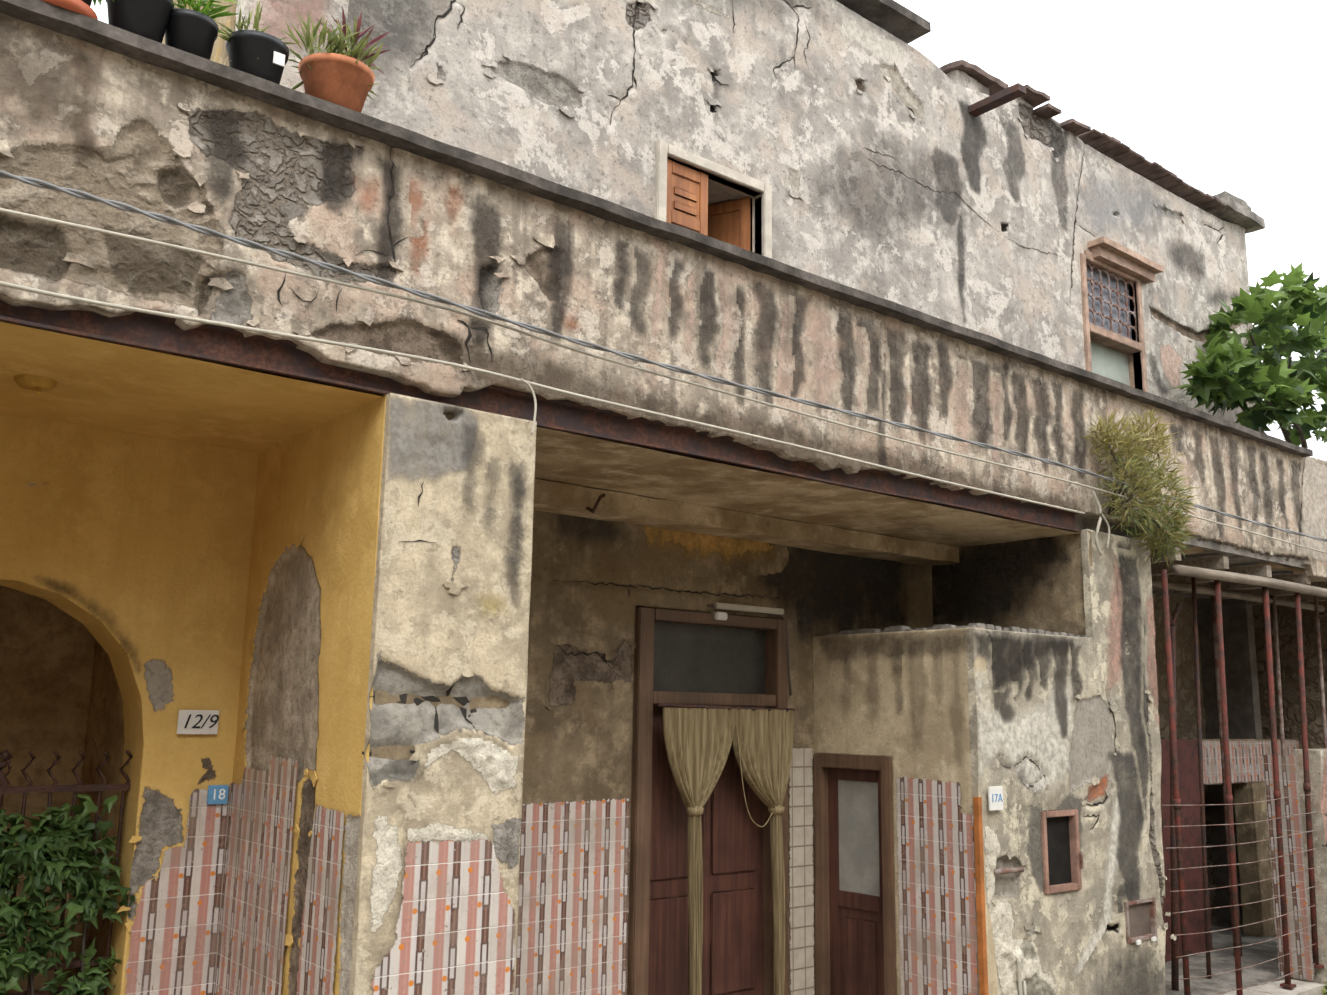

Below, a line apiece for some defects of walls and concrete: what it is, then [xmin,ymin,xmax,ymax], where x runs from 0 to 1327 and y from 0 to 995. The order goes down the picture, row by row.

crack [410,0,465,67]
crack [608,2,687,125]
crack [773,0,810,80]
flaking render [0,103,407,327]
damp [322,143,360,209]
damp [380,162,401,278]
damp [934,101,986,320]
damp [448,196,1084,507]
damp [1172,427,1301,537]
flaking render [240,534,321,995]
flaking render [365,654,526,787]
flaking render [117,786,184,932]